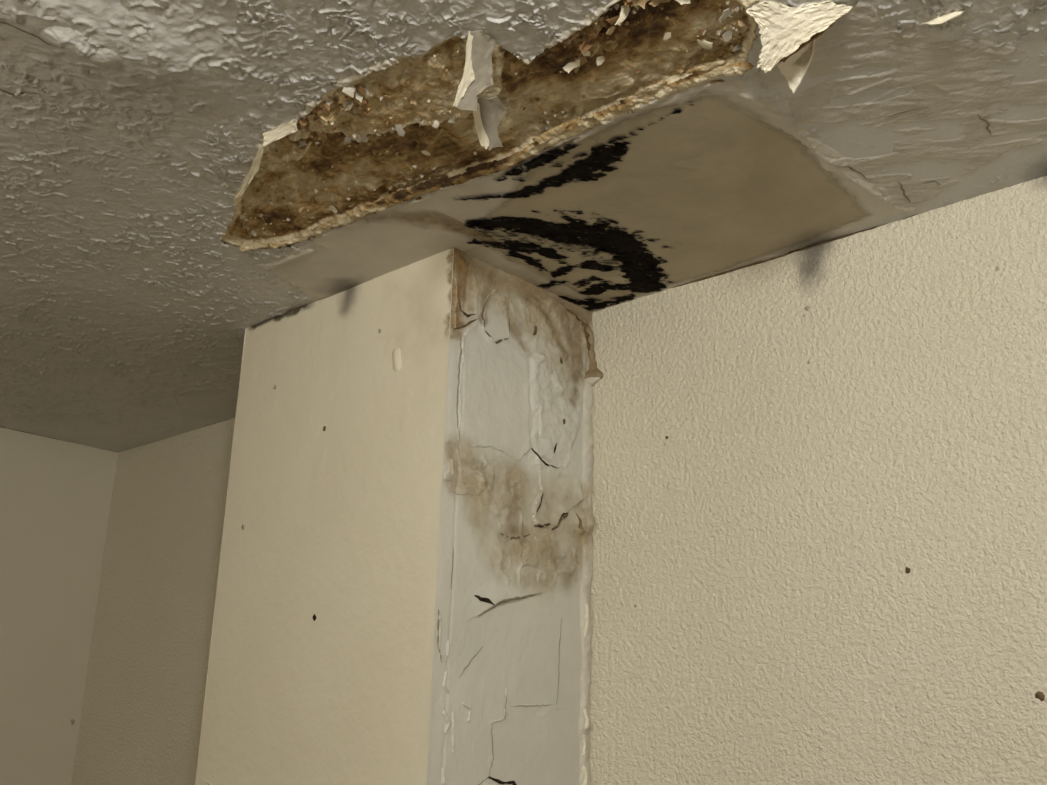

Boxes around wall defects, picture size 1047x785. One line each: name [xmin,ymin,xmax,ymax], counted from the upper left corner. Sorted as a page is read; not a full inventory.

peeling [432,30,507,150]
peeling [563,0,691,74]
peeling [697,6,747,52]
peeling [233,83,406,239]
leakage [455,104,693,200]
leakage [402,210,673,352]
crack [455,334,463,441]
peeling [443,260,584,587]
peeling [567,309,604,379]
crack [478,619,562,785]
peeling [483,688,589,785]